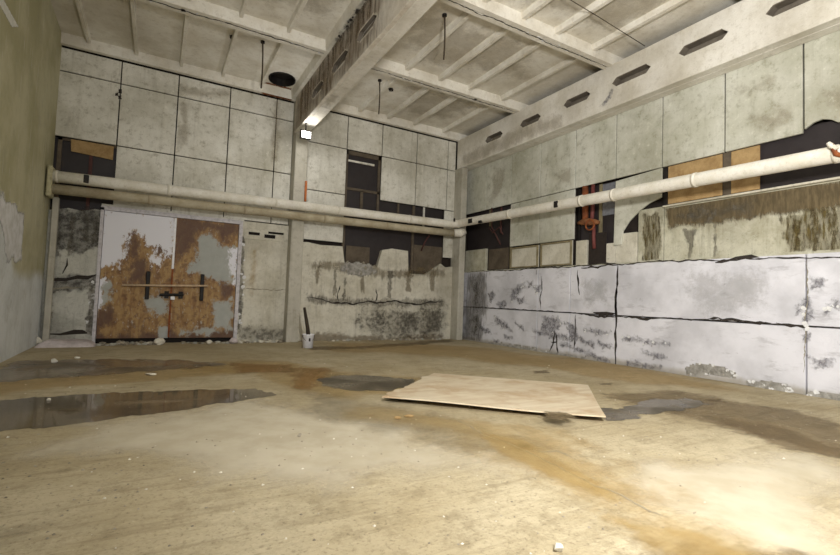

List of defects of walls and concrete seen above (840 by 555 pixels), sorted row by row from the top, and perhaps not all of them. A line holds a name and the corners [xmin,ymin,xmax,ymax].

peeling [0,193,24,263]
leakage [56,207,100,254]
leakage [666,181,840,251]
spalling [340,261,377,277]
crack [308,287,443,307]
leakage [356,308,444,338]
leakage [463,274,486,341]
crack [467,254,840,372]